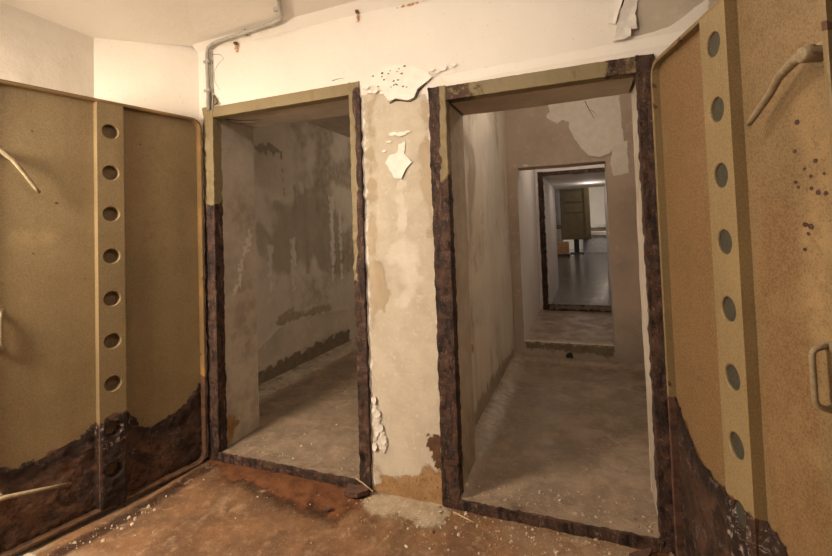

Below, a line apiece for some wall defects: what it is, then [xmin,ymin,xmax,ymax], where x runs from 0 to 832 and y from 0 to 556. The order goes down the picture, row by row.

peeling [608,0,638,41]
peeling [546,95,629,176]
damp [254,143,353,304]
damp [258,329,351,385]
flaking render [361,63,456,496]
corrosion [0,383,443,554]
corrosion [675,397,787,556]